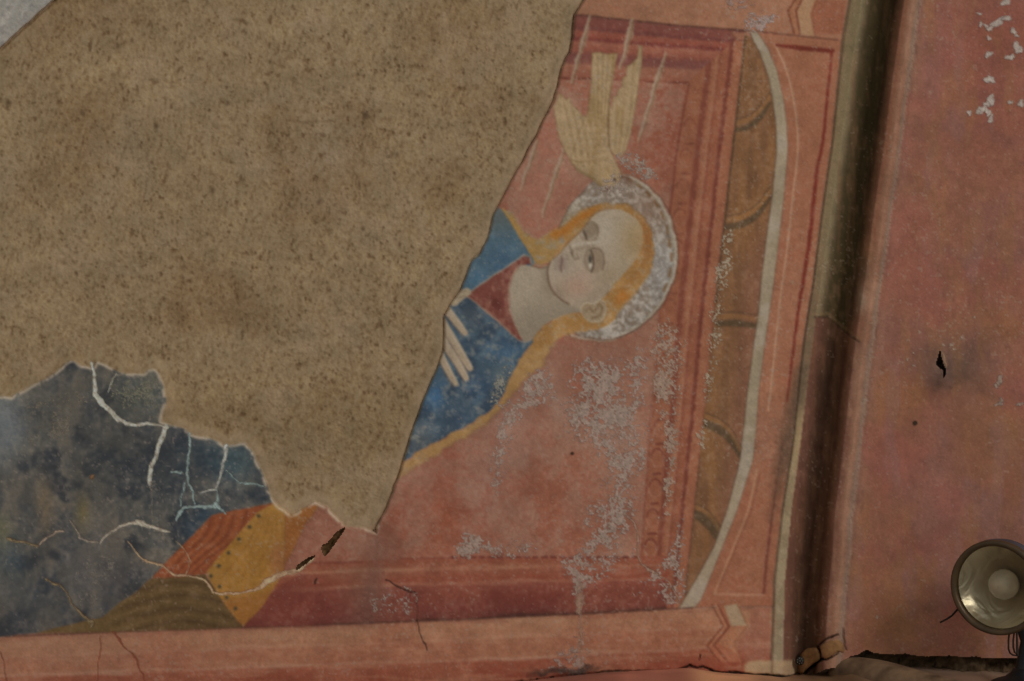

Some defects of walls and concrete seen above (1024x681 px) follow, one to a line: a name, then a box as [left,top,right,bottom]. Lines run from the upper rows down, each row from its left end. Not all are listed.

spalling [977,0,1023,60]
spalling [967,76,995,123]
flaking render [0,0,583,570]
spalling [936,337,963,378]
crack [7,362,314,595]
crack [46,578,145,681]